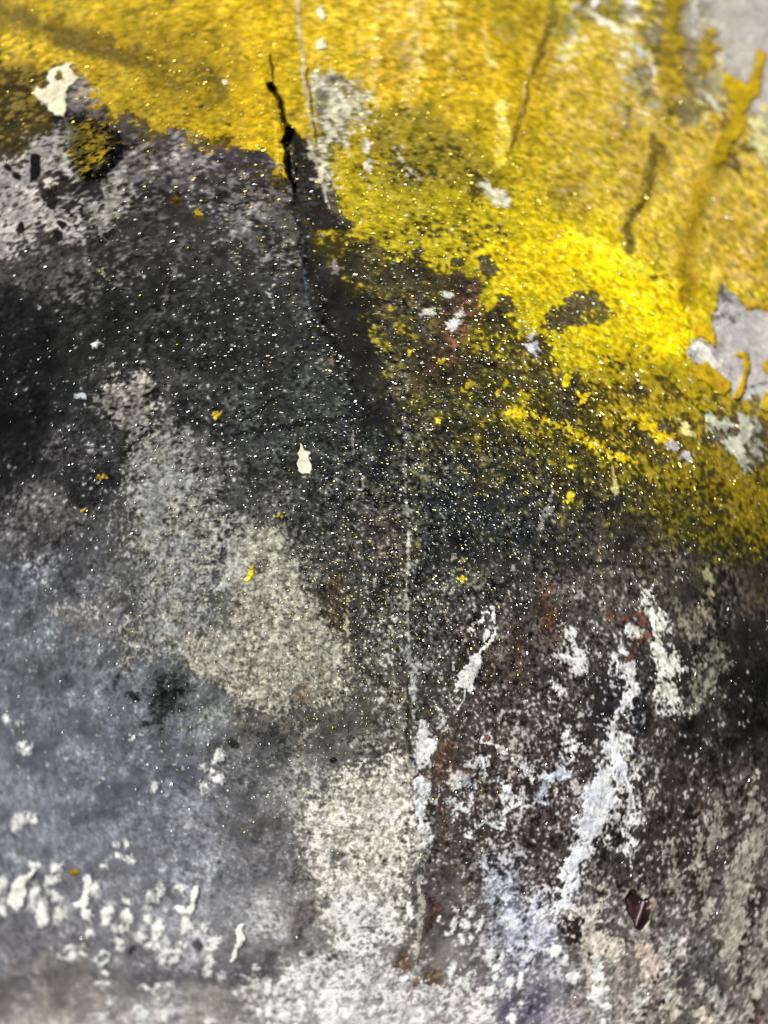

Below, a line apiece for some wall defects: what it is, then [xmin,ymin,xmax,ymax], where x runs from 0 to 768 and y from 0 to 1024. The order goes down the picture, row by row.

spalling [0,63,154,276]
peeling [106,50,262,164]
crack [267,54,306,191]
leakage [446,307,466,331]
peeling [152,49,768,840]
leakage [112,420,352,762]
leakage [454,627,498,710]
peeling [5,813,38,832]
leakage [476,567,768,1024]
peeling [0,841,246,1023]